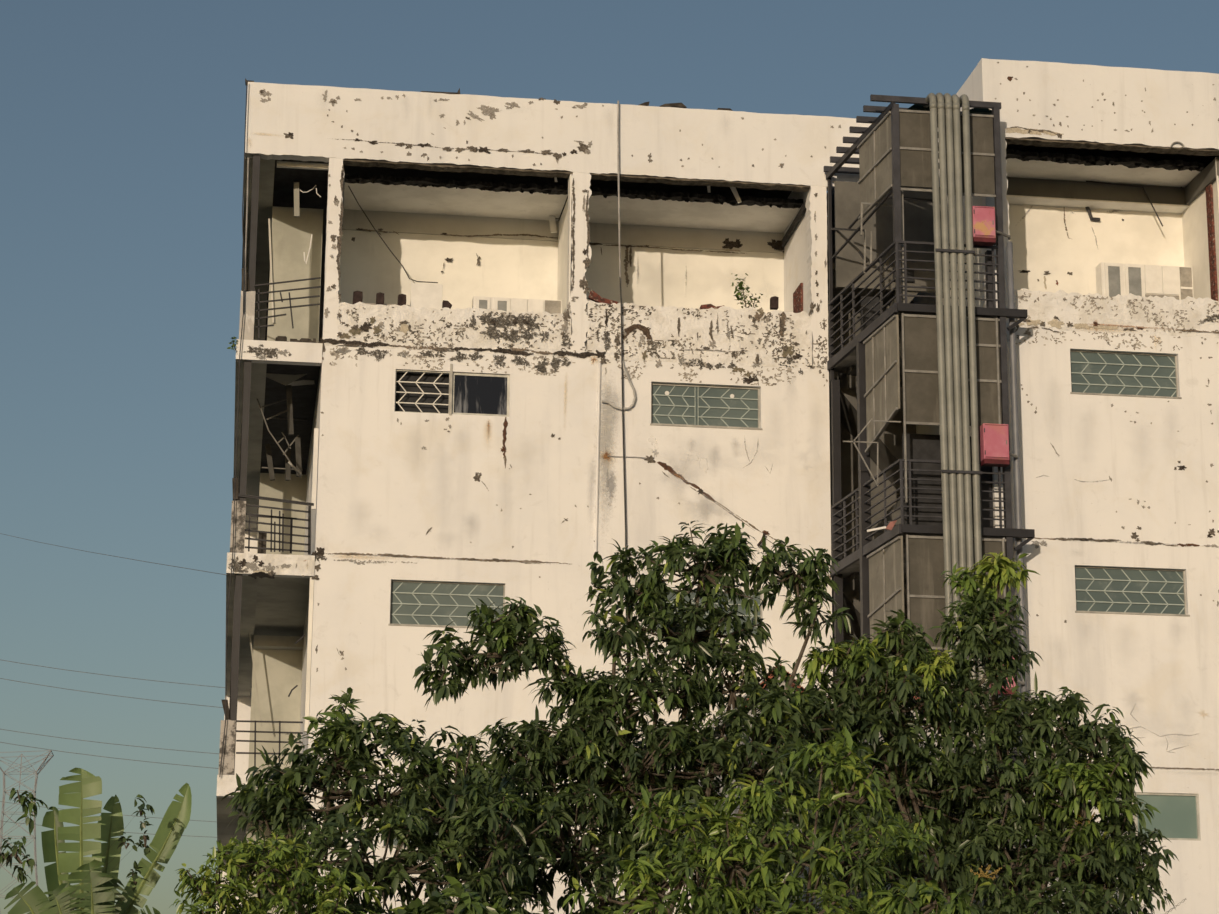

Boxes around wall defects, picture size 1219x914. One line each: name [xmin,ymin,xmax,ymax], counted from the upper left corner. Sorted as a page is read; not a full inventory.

peeling [322,90,363,153]
peeling [432,98,587,135]
spalling [995,76,1127,138]
spalling [533,141,592,166]
flaking render [1015,184,1219,359]
corrosion [488,417,508,468]
crack [643,455,802,563]
crack [1032,537,1218,548]
spalling [248,570,275,579]
crack [1103,704,1219,770]